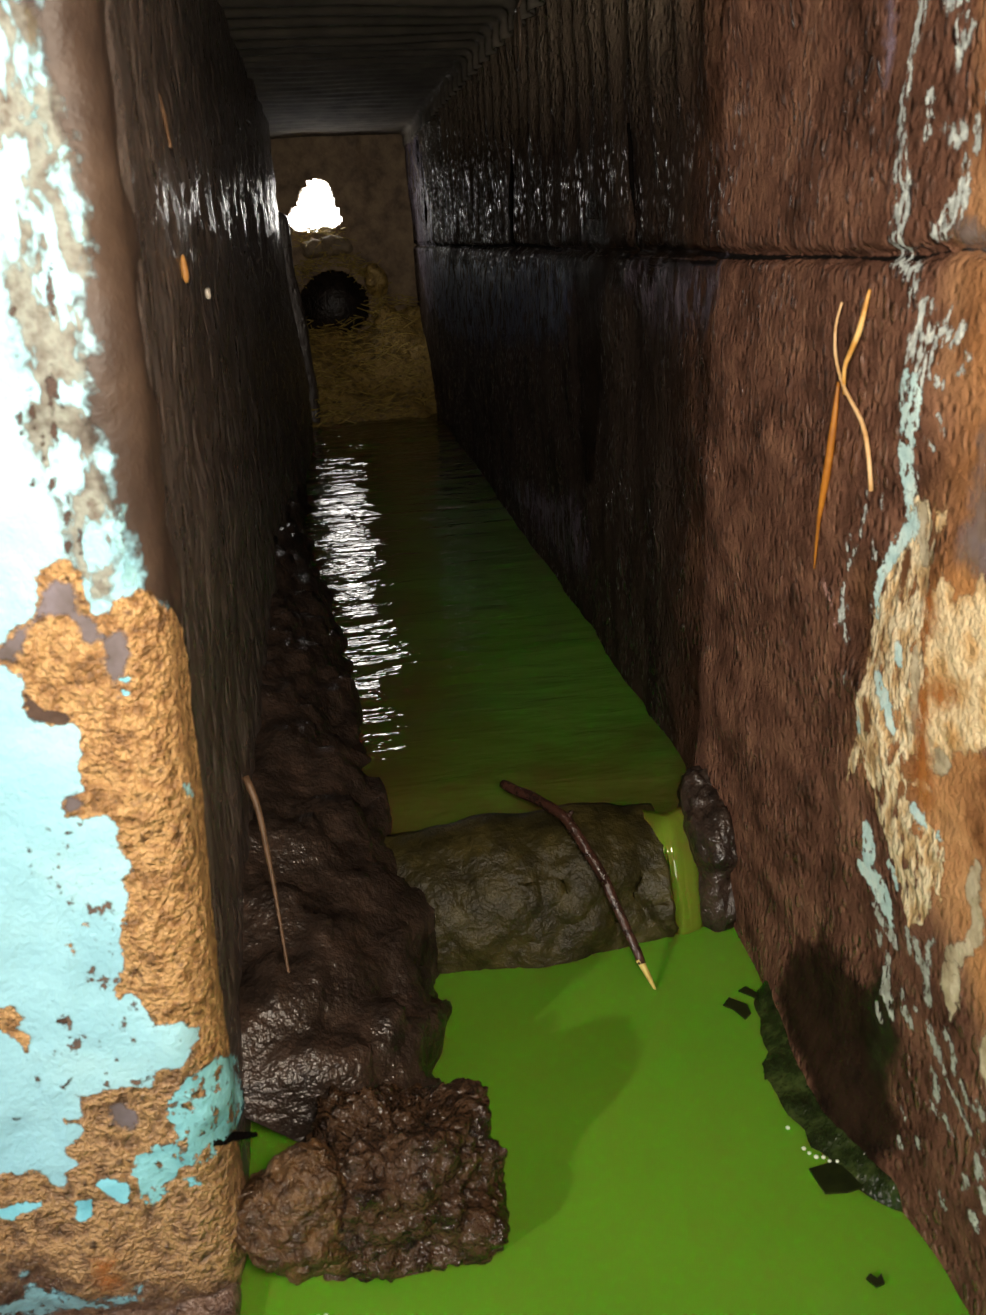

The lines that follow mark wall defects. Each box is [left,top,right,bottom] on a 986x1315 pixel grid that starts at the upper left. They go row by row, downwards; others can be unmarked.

peeling [48,142,85,242]
peeling [0,505,258,1315]
peeling [846,489,986,928]